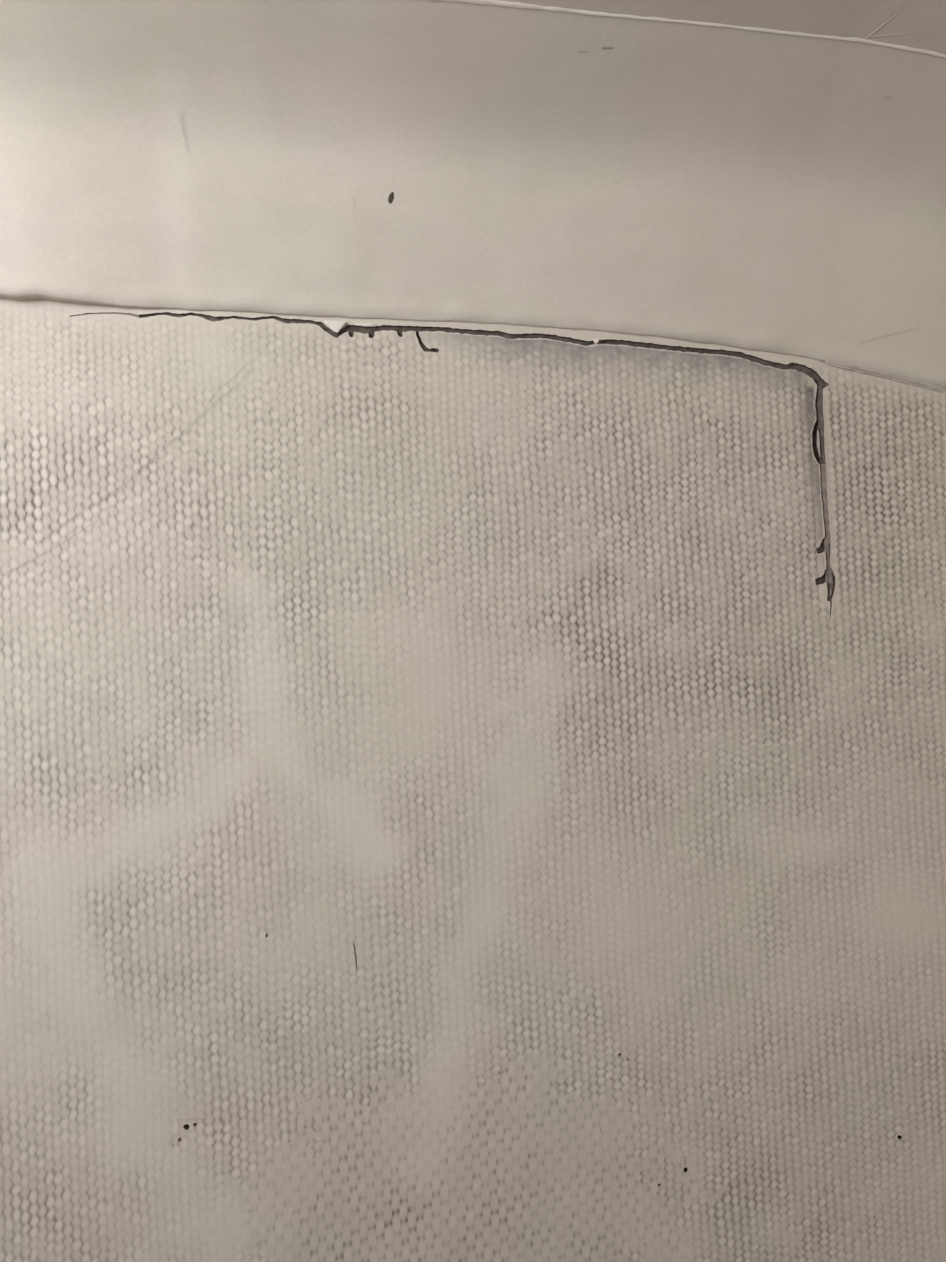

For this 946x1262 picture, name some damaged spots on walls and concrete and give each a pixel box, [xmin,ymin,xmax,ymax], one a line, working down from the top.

crack [70,312,946,617]